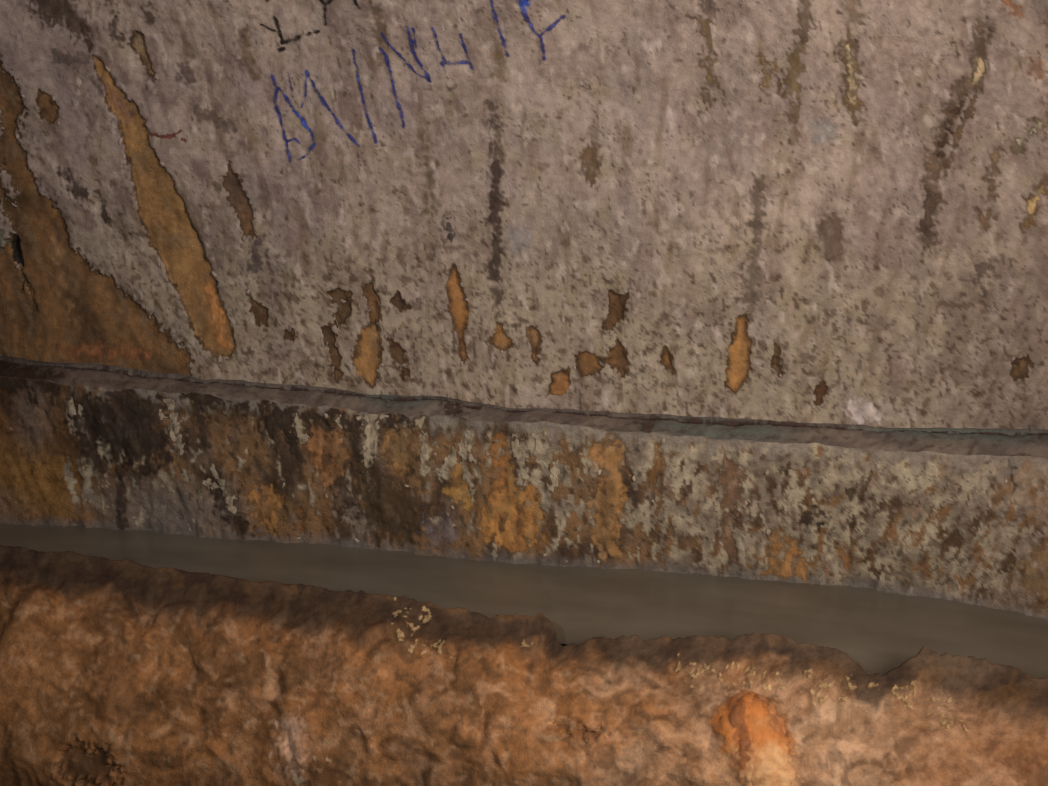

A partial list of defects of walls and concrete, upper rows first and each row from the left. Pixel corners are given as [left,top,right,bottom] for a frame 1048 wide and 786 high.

flaking render [128,30,160,82]
flaking render [0,50,236,376]
water stain [917,19,993,251]
water stain [976,116,1043,231]
water stain [1020,175,1048,229]
flaking render [321,279,412,388]
flaking render [446,264,469,366]
flaking render [526,326,542,363]
flaking render [547,289,630,396]
flaking render [657,346,676,375]
flaking render [725,312,753,393]
water stain [0,361,457,556]